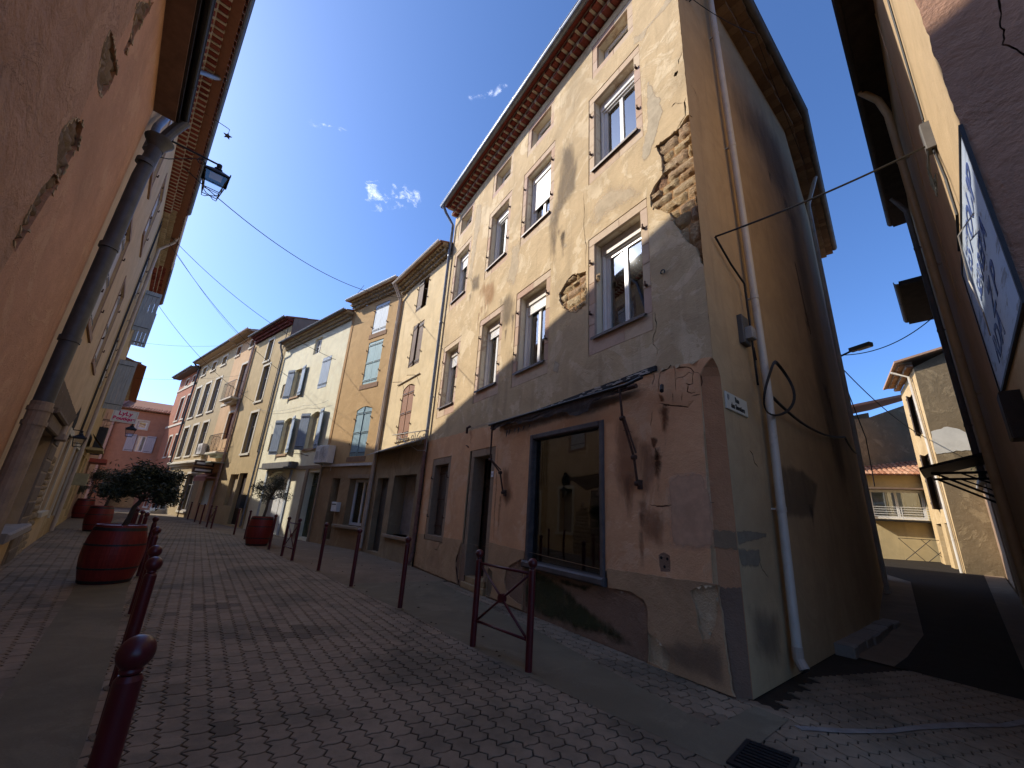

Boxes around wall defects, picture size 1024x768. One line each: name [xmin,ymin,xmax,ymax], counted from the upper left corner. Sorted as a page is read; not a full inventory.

spalling [97,0,152,98]
crack [998,0,1024,56]
spalling [13,117,84,248]
spalling [651,107,704,265]
spalling [558,273,601,312]
crack [653,365,703,408]